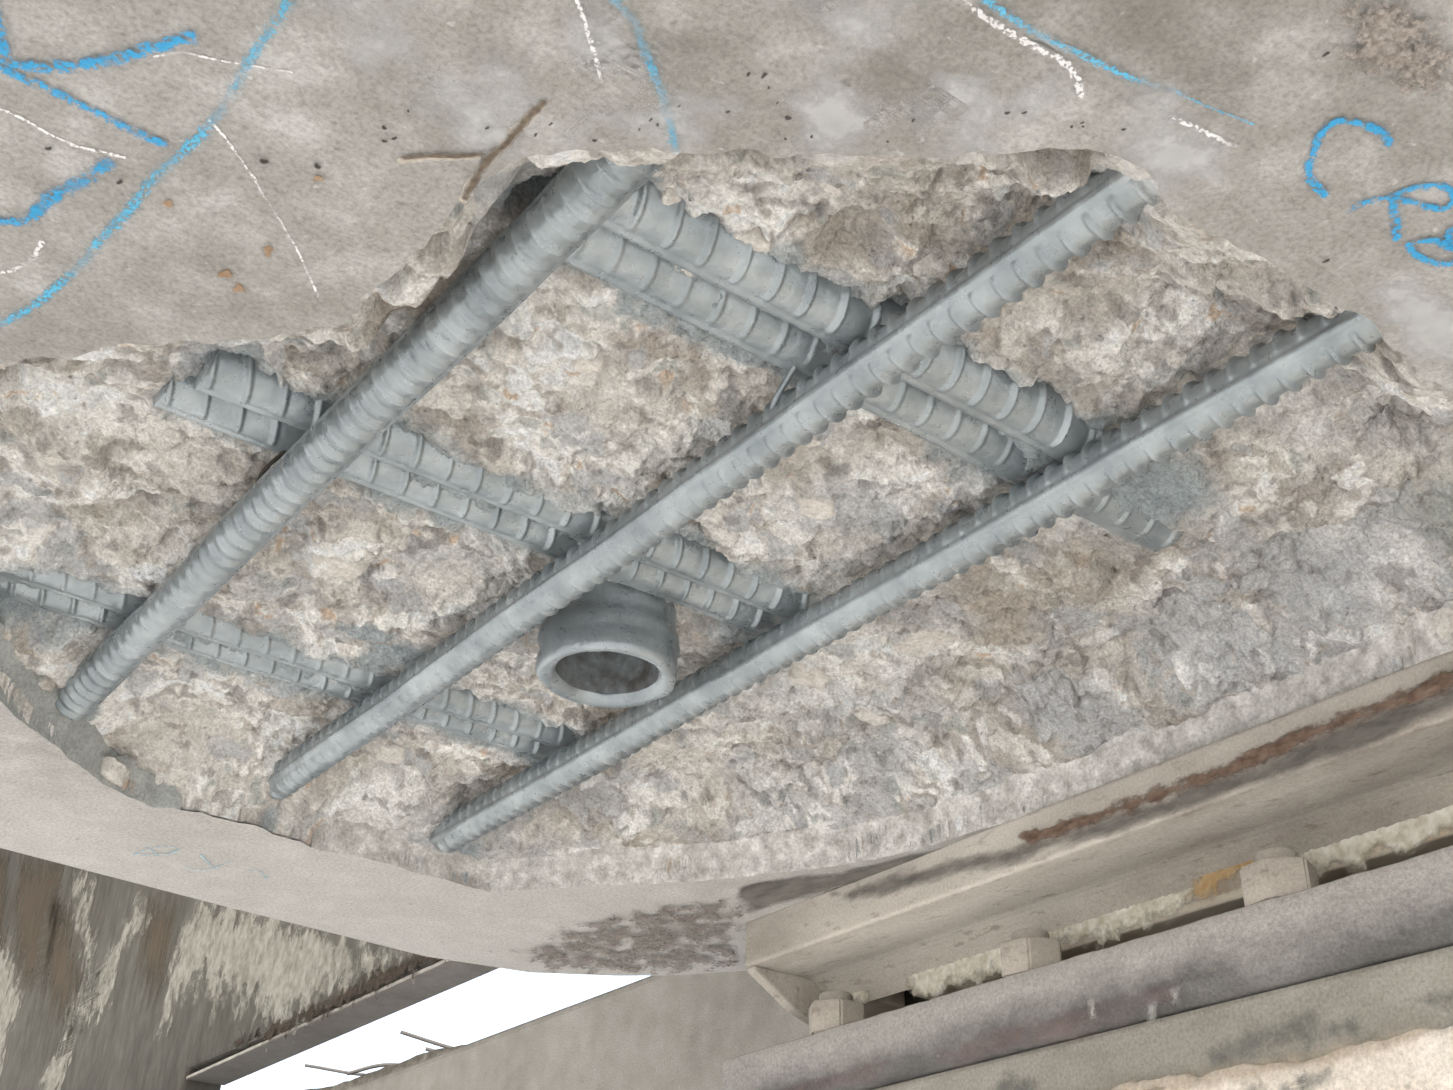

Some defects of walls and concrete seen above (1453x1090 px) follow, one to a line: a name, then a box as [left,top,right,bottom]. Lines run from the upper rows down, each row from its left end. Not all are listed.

spalling [0,147,1453,892]
rust [1018,671,1453,845]
efflorescence [0,935,24,1076]
efflorescence [39,871,150,1090]
efflorescence [155,900,409,1035]
spalling [531,900,743,974]